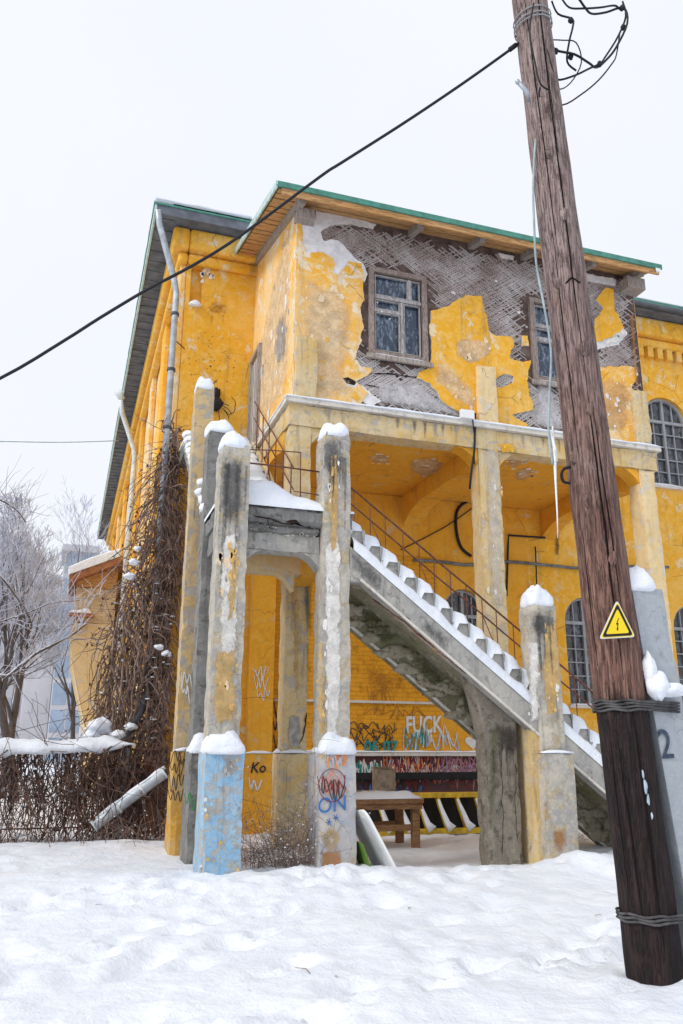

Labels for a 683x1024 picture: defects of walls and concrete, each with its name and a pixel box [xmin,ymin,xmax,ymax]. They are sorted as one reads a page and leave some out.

flaking render [260,211,563,431]
flaking render [586,269,643,432]
water stain [219,464,247,572]
water stain [329,457,347,509]
peeling [487,443,539,603]
spalling [213,455,473,747]
water stain [536,617,553,669]
water stain [485,726,519,807]
spalling [576,792,612,847]